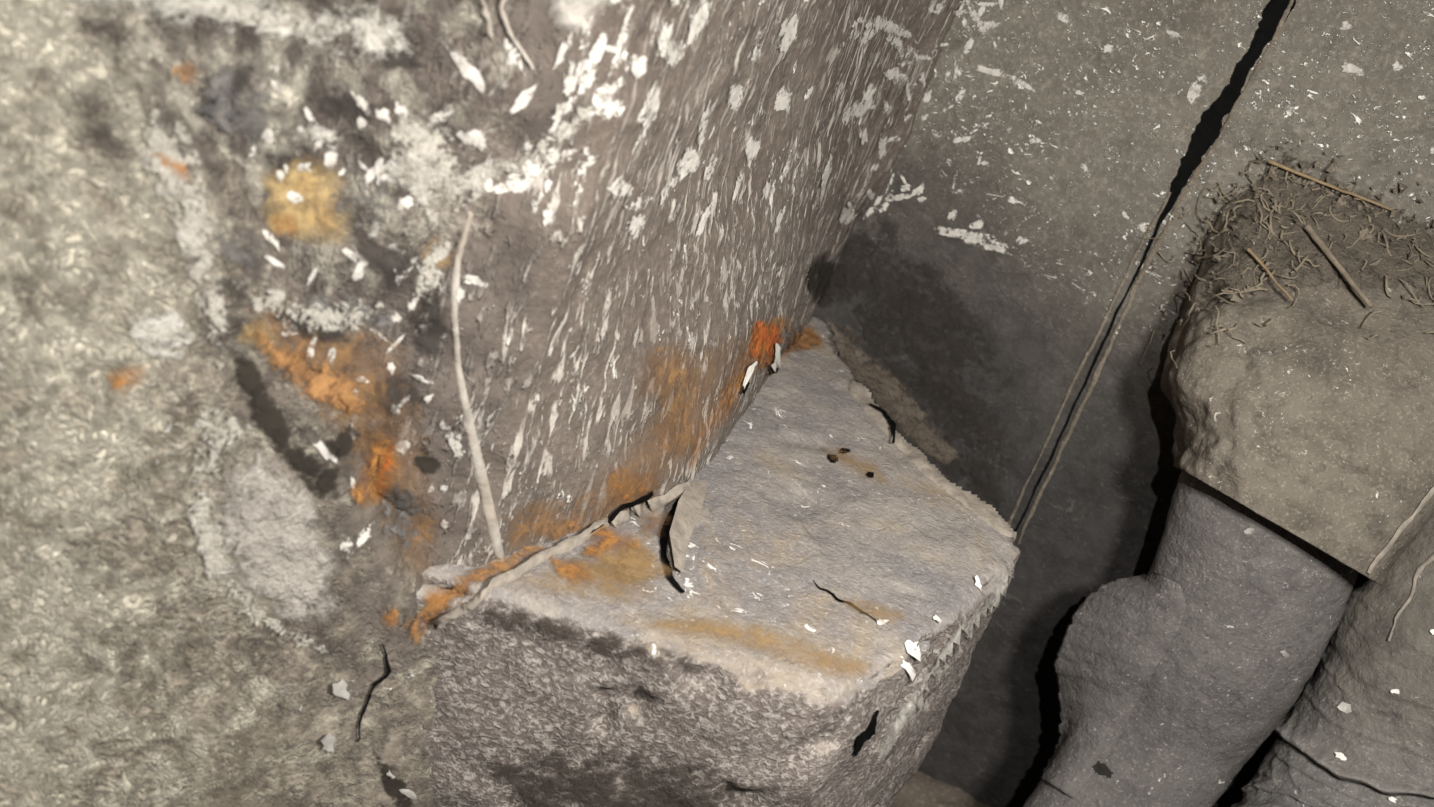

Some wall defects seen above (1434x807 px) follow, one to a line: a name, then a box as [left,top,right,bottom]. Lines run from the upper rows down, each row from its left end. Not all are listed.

corrosion [268,164,340,237]
crack [1008,0,1296,544]
corrosion [246,314,413,503]
corrosion [654,316,822,466]
corrosion [385,468,664,642]
crack [660,497,686,593]
crack [814,581,877,621]
crack [357,644,391,742]